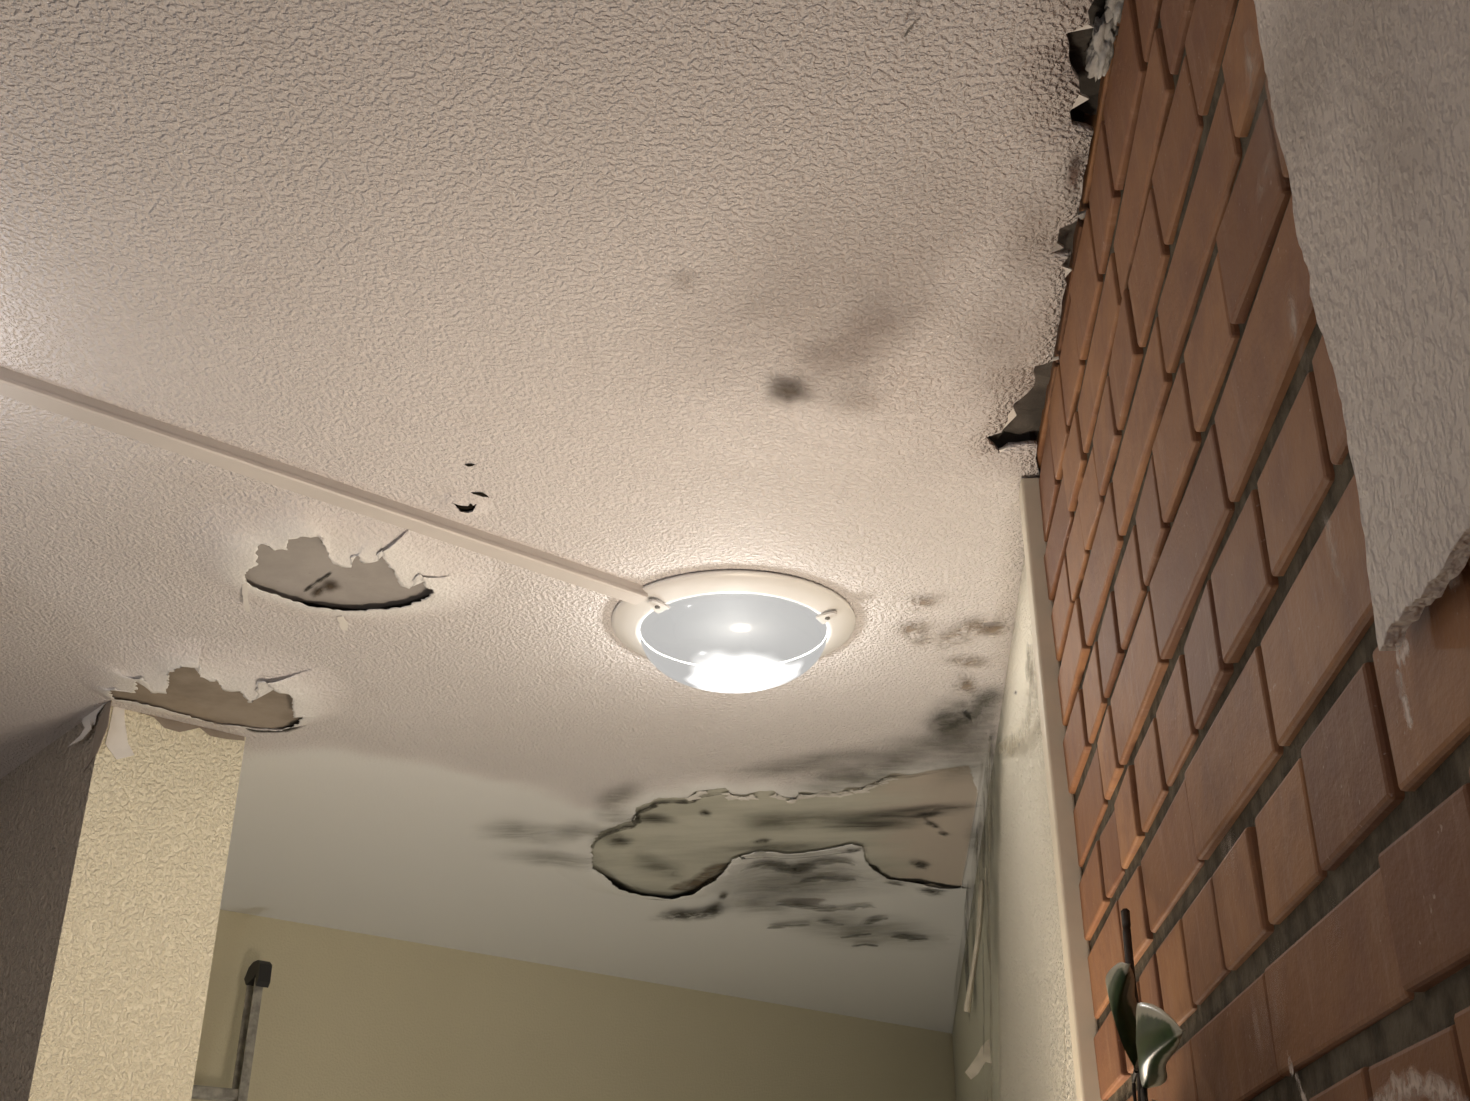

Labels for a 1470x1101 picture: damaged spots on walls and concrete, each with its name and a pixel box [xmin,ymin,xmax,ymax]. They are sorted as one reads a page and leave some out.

spalling [1067,0,1124,115]
spalling [1051,209,1087,295]
water stain [775,383,804,401]
spalling [991,348,1059,453]
spalling [177,488,499,631]
water stain [953,624,1003,636]
spalling [68,634,354,772]
water stain [573,765,993,930]
water stain [768,889,927,947]